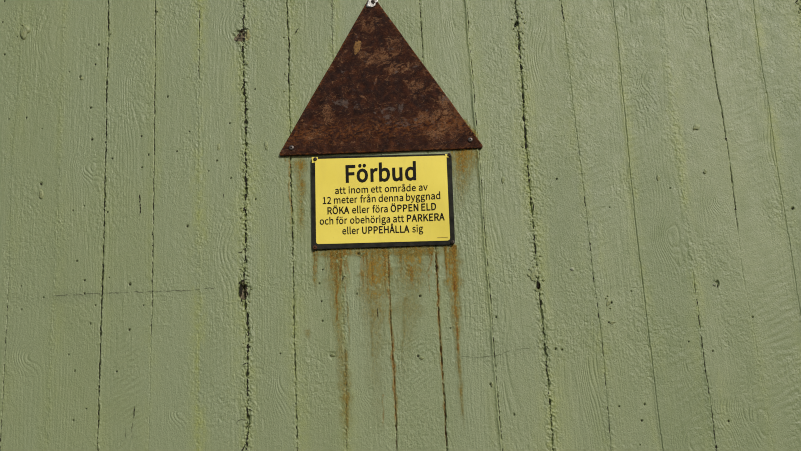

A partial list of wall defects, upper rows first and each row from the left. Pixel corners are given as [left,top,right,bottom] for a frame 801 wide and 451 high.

rust [451,149,477,184]
rust [313,245,460,350]